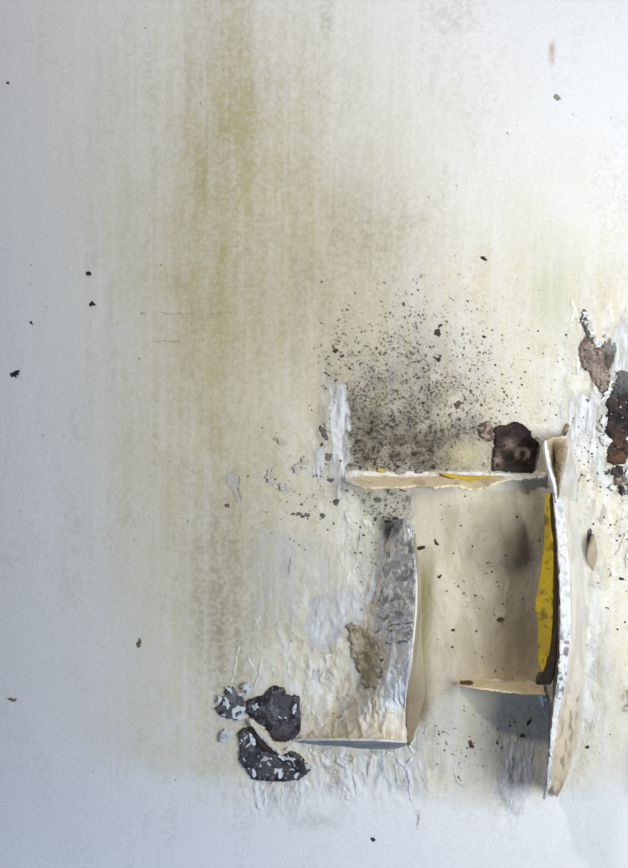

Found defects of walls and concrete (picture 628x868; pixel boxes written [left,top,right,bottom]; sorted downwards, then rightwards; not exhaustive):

leakage [218,68,254,193]
leakage [320,294,508,472]
leakage [345,489,407,538]
peeling [214,518,426,782]
leakage [421,578,429,652]
peeling [344,421,587,800]